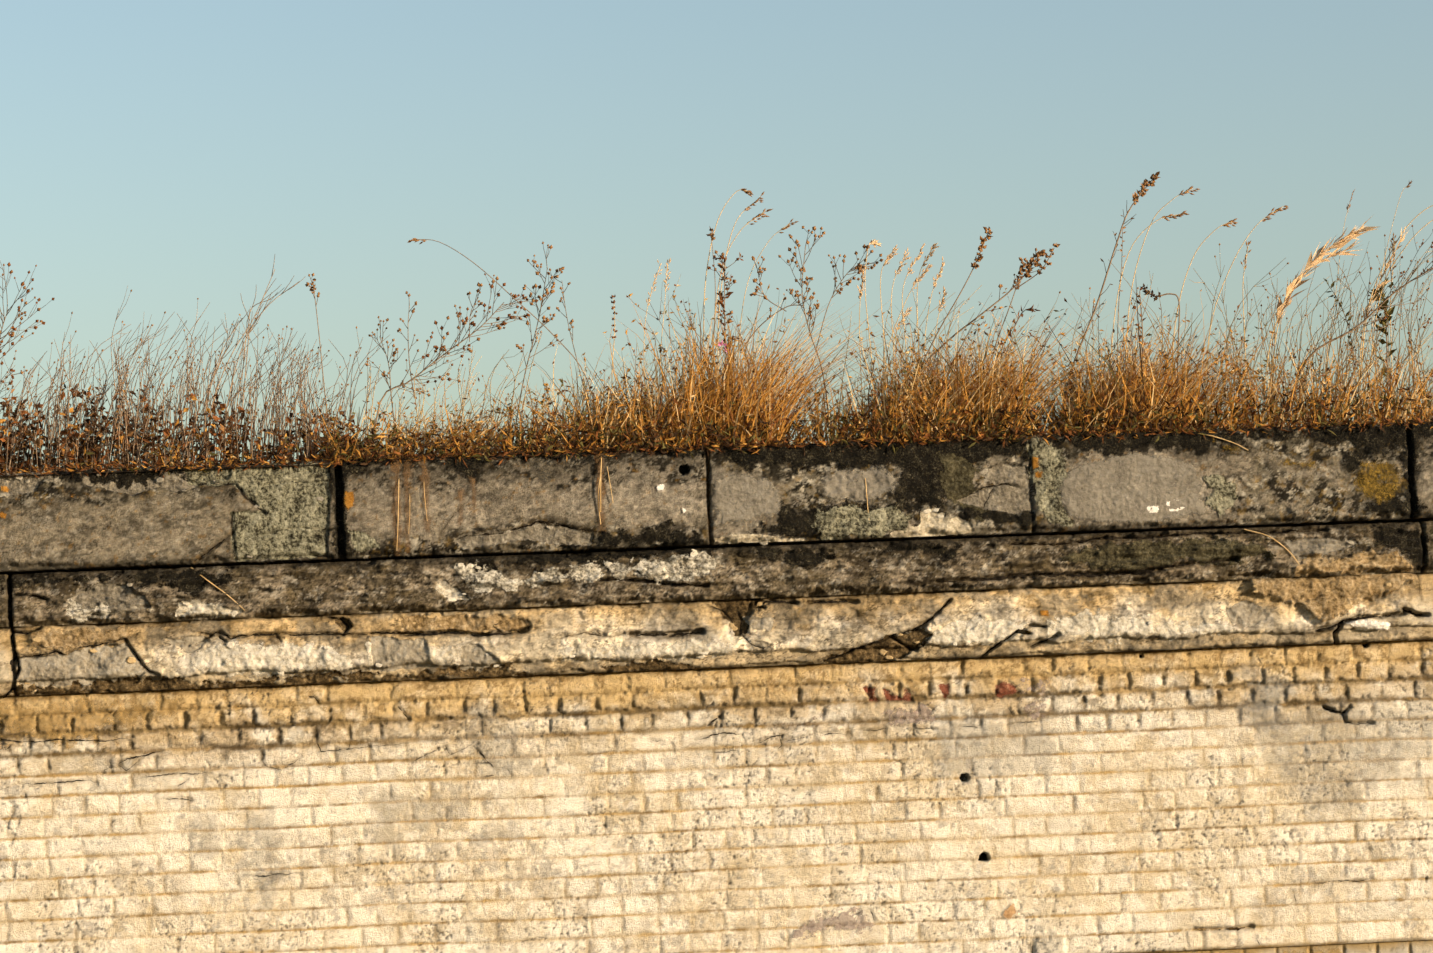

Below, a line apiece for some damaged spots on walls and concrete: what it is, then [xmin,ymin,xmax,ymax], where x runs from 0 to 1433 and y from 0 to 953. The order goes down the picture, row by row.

damp [1045,422,1433,567]
spalling [1284,537,1362,559]
crack [1,588,154,699]
spalling [66,582,150,618]
crack [824,530,1321,661]
crack [1315,575,1422,644]
crack [0,738,207,801]